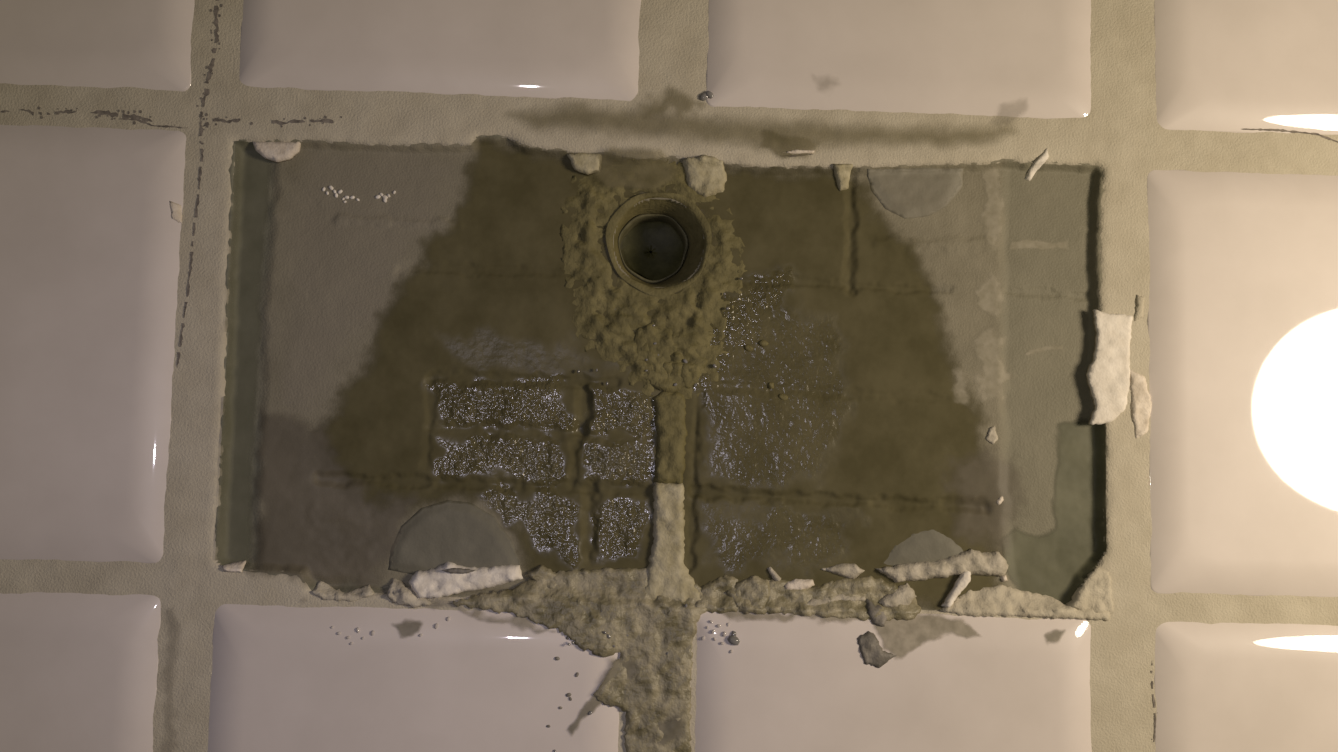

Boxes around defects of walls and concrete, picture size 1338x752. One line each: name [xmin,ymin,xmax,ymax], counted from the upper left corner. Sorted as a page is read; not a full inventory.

crack [1242,128,1338,142]
crack [1,0,342,368]
peeling [253,142,301,163]
peeling [567,153,602,176]
peeling [683,155,727,197]
peeling [833,164,853,191]
peeling [1025,149,1049,181]
water stain [216,97,1107,608]
peeling [1086,295,1152,439]
peeling [985,426,998,444]
peeling [409,562,523,599]